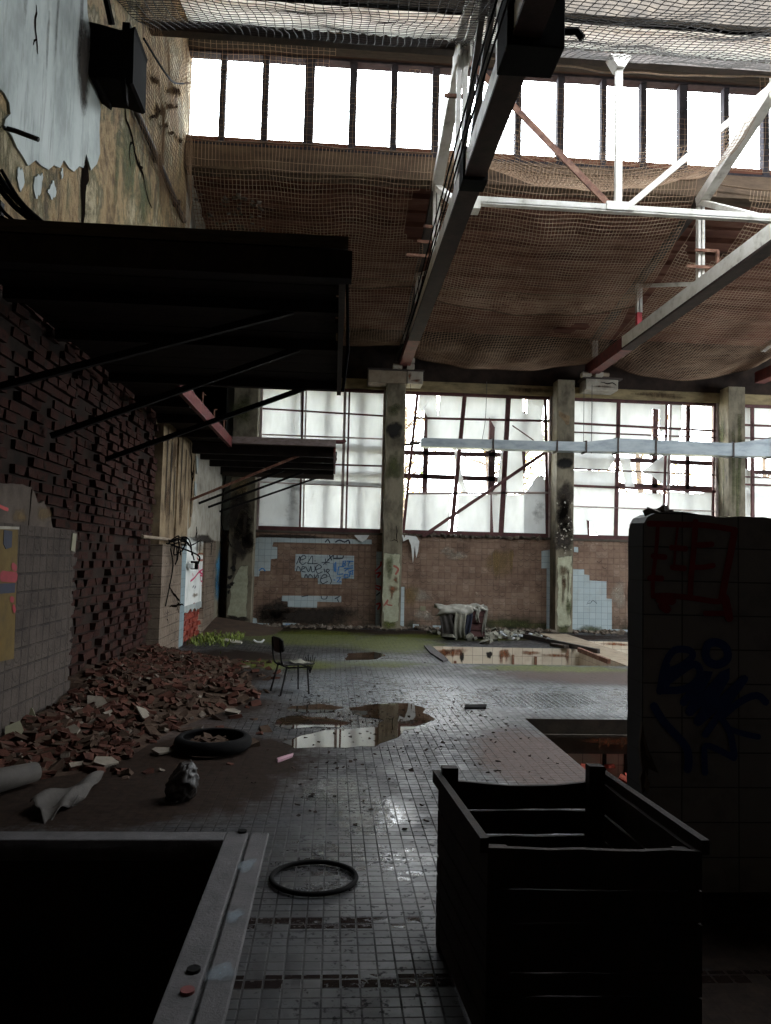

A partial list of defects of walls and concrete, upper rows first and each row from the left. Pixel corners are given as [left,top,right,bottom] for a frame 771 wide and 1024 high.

peeling [0,0,101,200]
water stain [557,458,573,469]
peeling [0,483,53,528]
water stain [555,483,573,550]